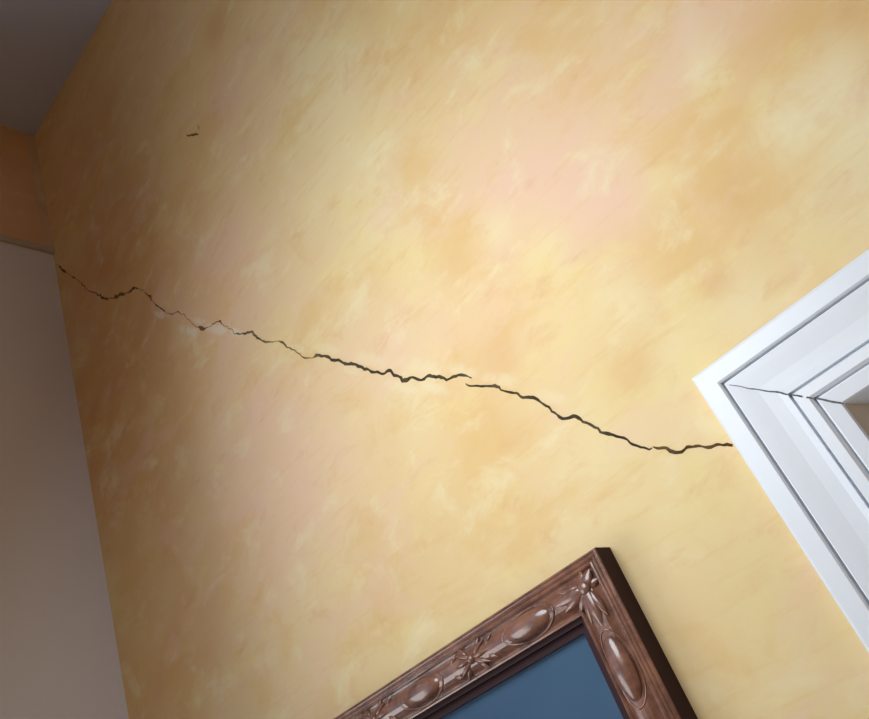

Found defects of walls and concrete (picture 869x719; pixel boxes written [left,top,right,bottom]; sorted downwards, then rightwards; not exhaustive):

crack [57,264,733,454]